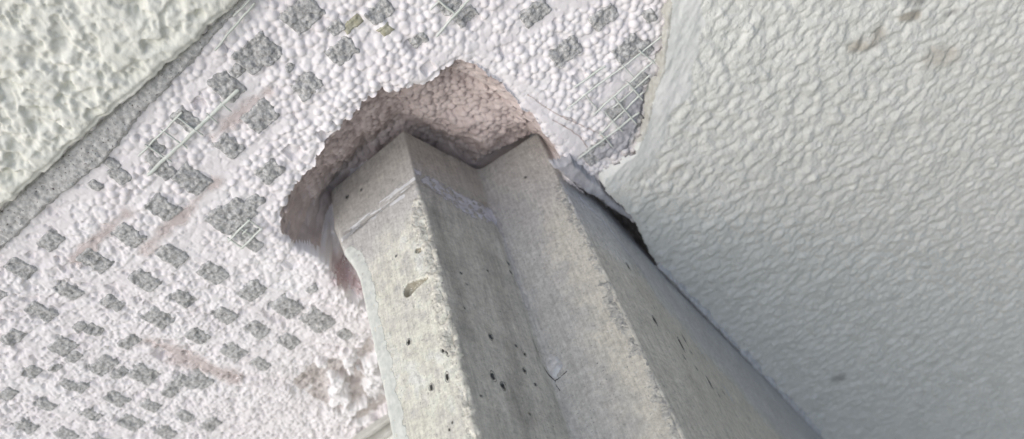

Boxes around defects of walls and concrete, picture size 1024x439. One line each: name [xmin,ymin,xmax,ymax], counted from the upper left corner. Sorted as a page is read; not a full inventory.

spalling [280,59,681,439]
spalling [635,0,673,142]